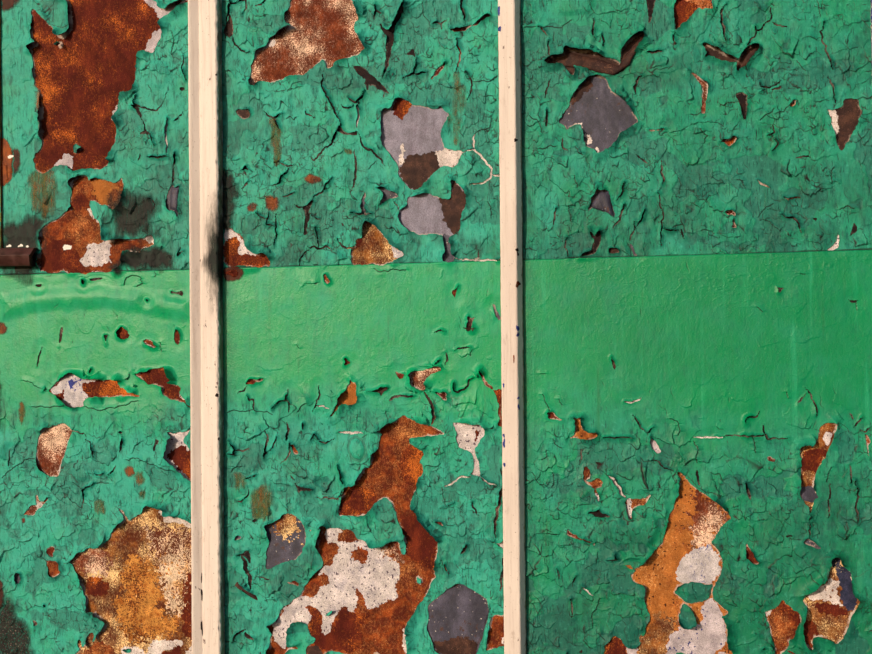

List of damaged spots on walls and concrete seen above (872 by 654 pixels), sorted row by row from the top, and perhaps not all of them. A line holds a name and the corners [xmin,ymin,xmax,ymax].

corrosion [1,0,188,278]
crack [252,0,430,270]
peeling [350,60,470,267]
crack [463,115,500,216]
crack [609,150,689,250]
peeling [45,364,191,411]
corrosion [67,467,192,654]
corrosion [265,411,449,654]
peeling [423,580,493,654]
peeling [449,369,505,480]
crack [531,394,792,506]
corrosion [600,468,737,654]